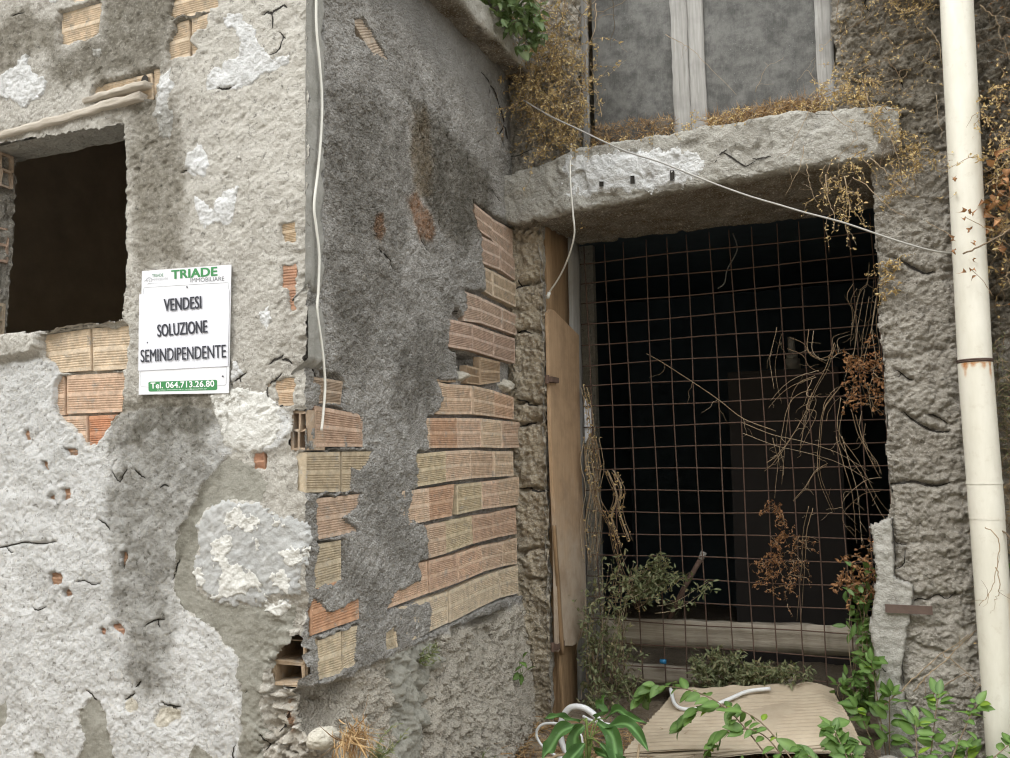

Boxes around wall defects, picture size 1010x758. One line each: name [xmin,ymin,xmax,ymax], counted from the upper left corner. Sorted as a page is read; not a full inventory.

peeling [0,53,47,108]
spalling [62,0,102,58]
spalling [95,0,218,139]
peeling [206,13,290,91]
crack [264,4,287,55]
spalling [282,222,296,243]
spalling [283,264,298,311]
spalling [45,326,130,455]
spalling [386,204,520,650]
crack [0,541,55,553]
peeling [79,695,114,758]